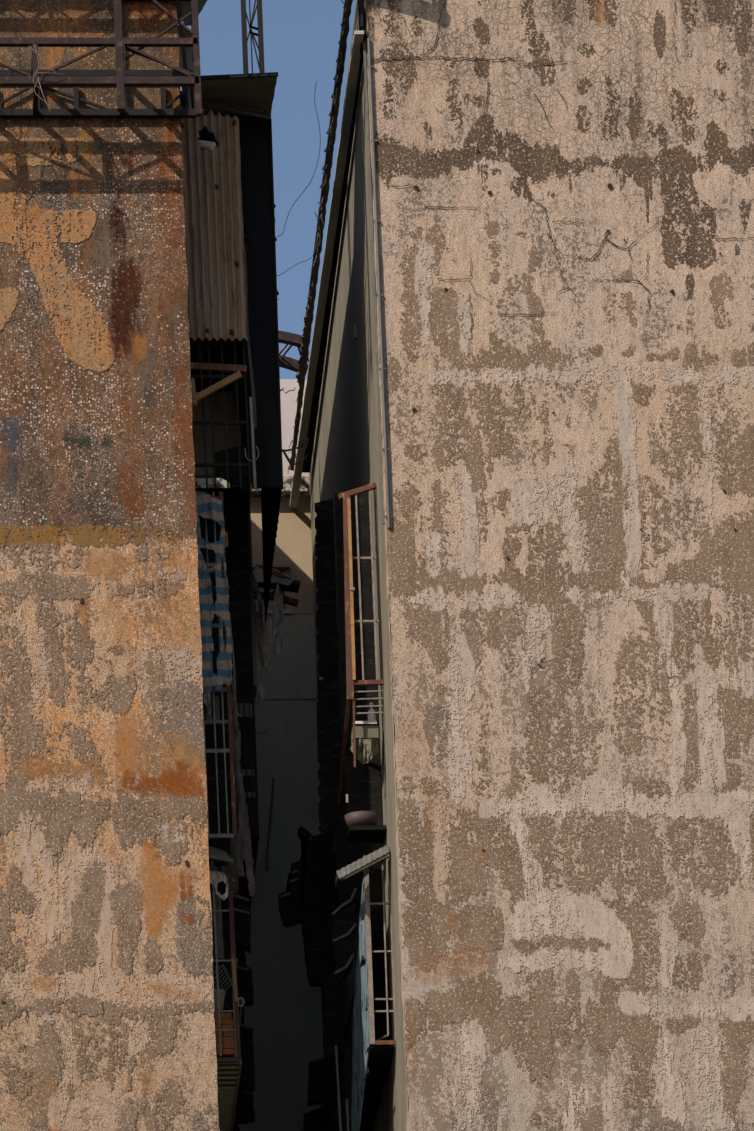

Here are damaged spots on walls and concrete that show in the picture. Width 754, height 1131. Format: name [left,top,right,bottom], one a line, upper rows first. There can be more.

crack [371,0,574,129]
rust [109,207,146,363]
crack [437,199,658,353]
rust [115,712,206,797]